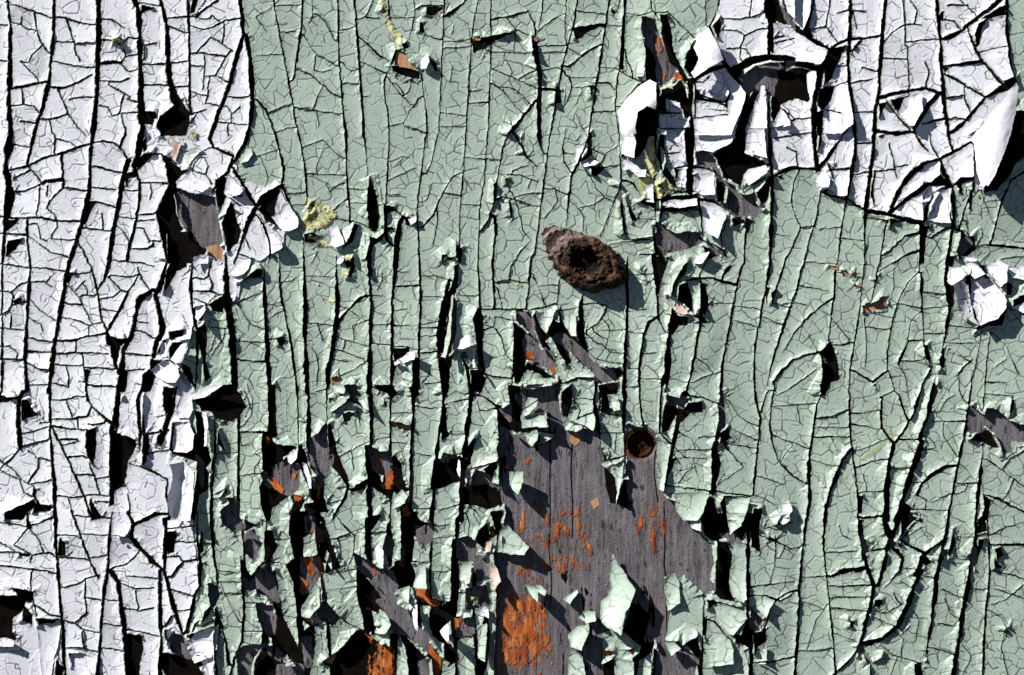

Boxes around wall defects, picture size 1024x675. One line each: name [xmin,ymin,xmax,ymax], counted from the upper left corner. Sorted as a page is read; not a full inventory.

peeling [877,93,923,126]
peeling [888,5,1024,331]
peeling [83,201,96,225]
crack [0,0,695,675]
peeling [109,0,863,675]
crack [560,0,1024,675]
peeling [86,427,97,464]
peeling [965,399,1024,456]
corrosion [634,500,668,554]
peeling [881,499,917,549]
corrosion [494,501,595,675]
corrosion [360,630,395,675]